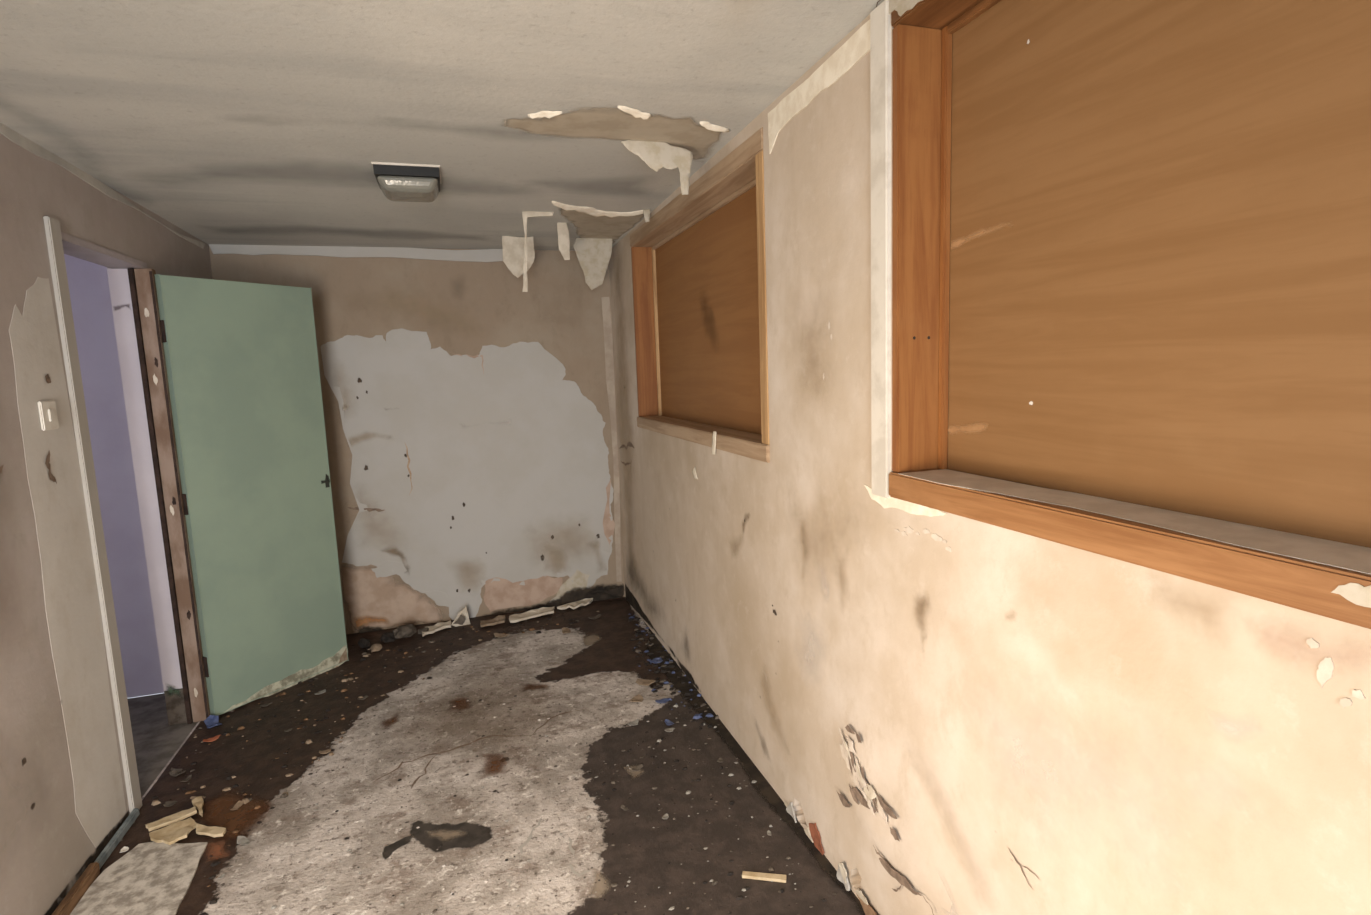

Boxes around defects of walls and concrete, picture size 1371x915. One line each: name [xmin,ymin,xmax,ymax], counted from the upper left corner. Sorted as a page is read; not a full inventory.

peeling [321,297,622,630]
peeling [1331,583,1371,608]
peeling [1306,638,1334,688]
spalling [837,725,900,841]